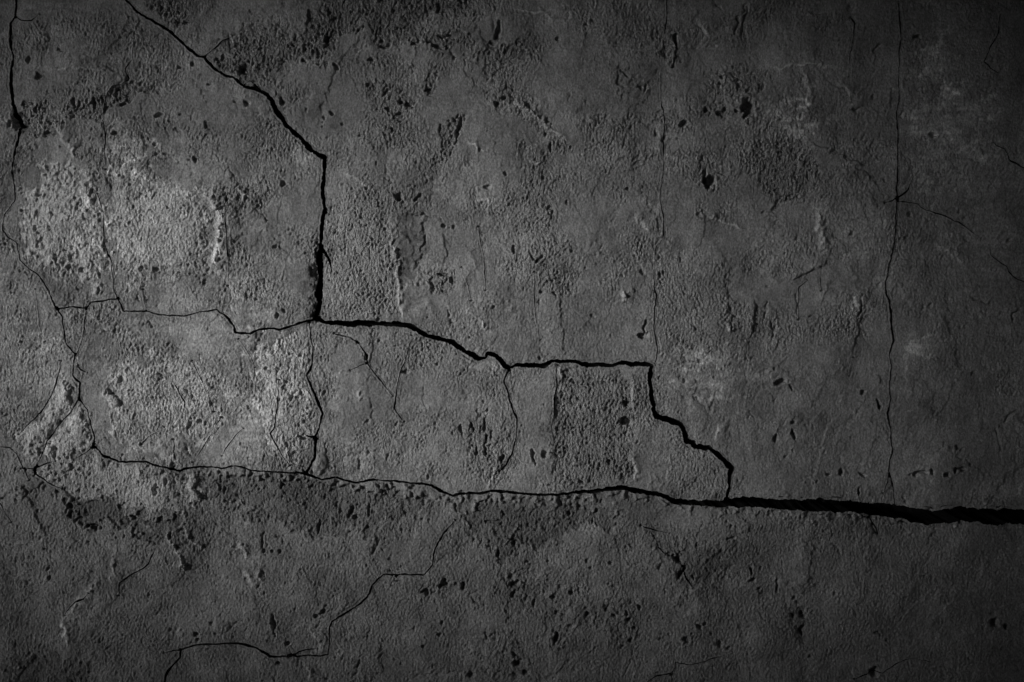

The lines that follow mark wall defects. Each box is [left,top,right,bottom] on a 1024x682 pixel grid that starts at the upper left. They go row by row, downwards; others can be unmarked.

crack [1,0,1024,538]
crack [164,521,455,682]